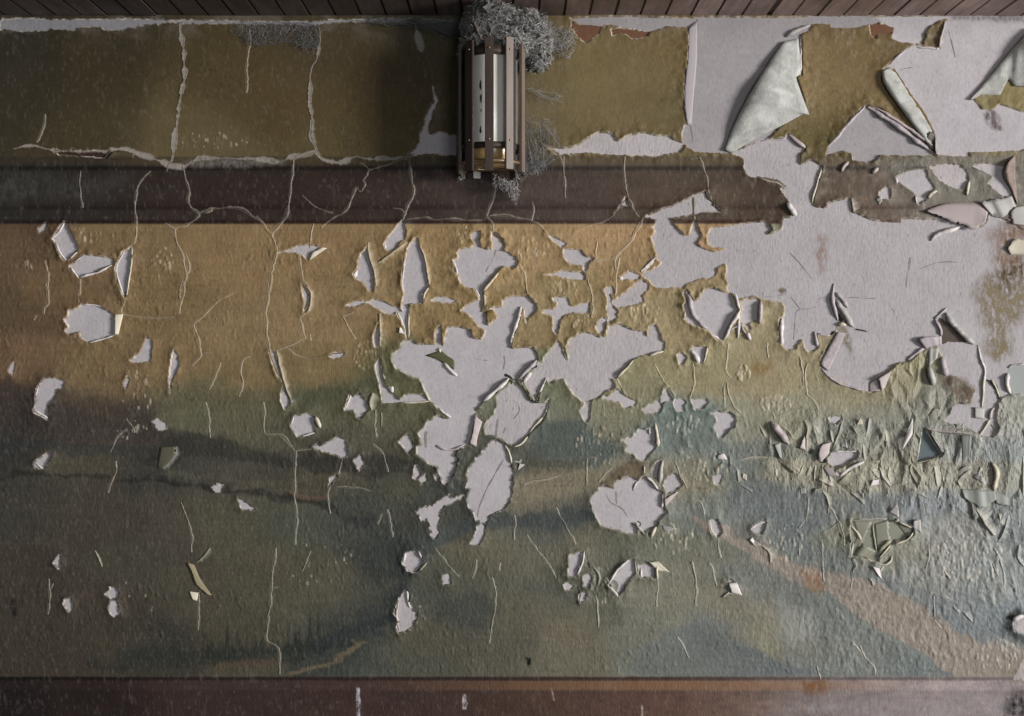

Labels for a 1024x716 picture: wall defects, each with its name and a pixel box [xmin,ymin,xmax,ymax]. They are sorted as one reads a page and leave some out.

peeling [39,222,133,296]
peeling [66,304,123,343]
crack [13,21,549,674]
peeling [345,16,1024,567]
peeling [33,378,65,419]
peeling [395,590,417,632]
peeling [403,551,427,571]
crack [512,507,591,604]
peeling [564,551,669,628]
peeling [850,505,922,586]